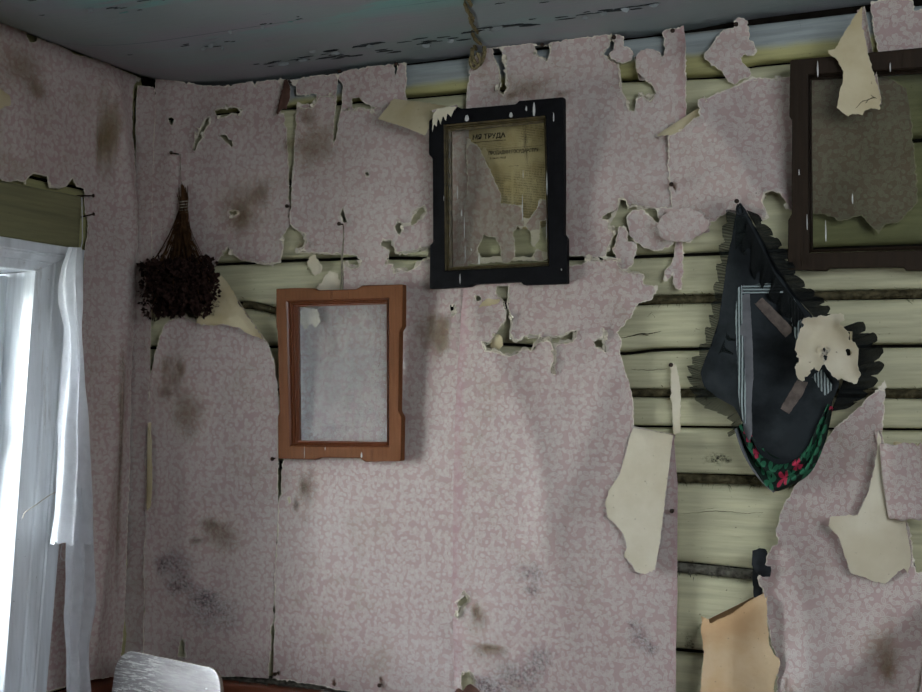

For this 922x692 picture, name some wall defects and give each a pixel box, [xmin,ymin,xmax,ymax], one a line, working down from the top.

peeling [555,3,659,20]
peeling [253,19,540,67]